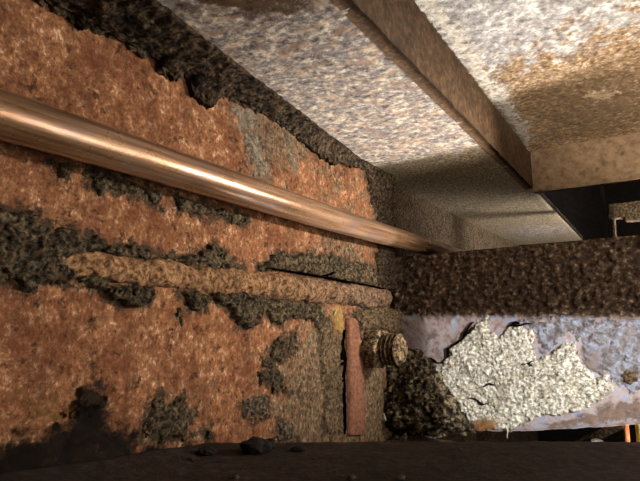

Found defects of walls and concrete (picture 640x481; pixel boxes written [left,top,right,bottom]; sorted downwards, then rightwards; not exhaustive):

corrosion [201,0,312,23]
crack [265,268,392,290]
peeling [331,305,344,334]
corrosion [0,351,166,474]